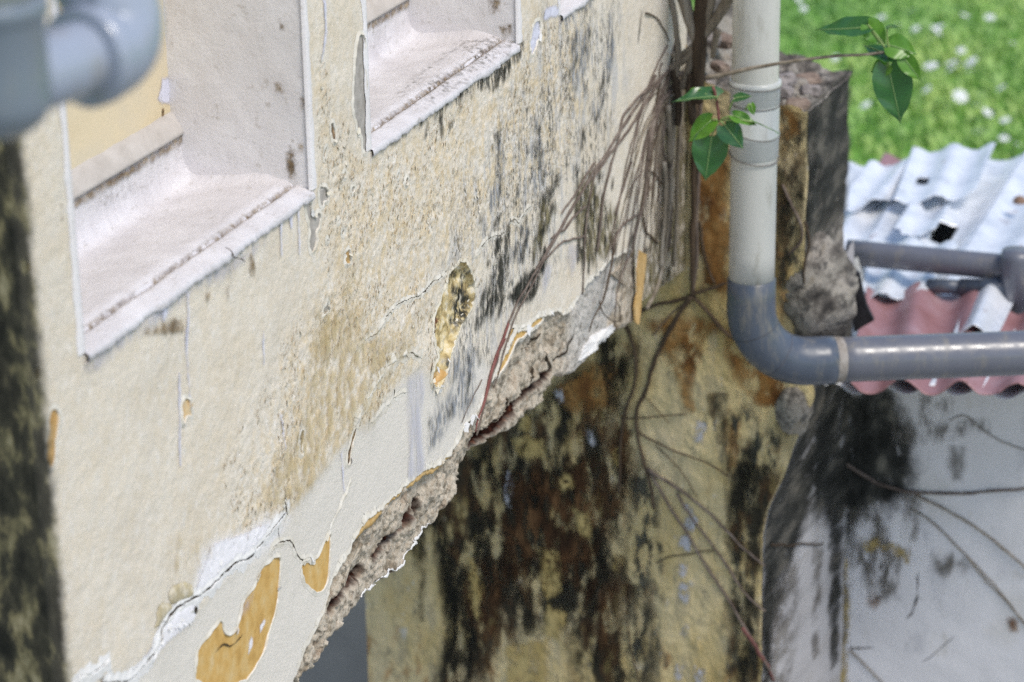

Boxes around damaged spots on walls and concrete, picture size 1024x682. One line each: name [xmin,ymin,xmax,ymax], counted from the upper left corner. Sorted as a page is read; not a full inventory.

damp [373,25,523,138]
damp [544,2,614,121]
damp [475,119,561,329]
damp [575,169,633,273]
damp [643,80,687,300]
crack [71,490,316,682]
peeling [133,319,307,682]
crack [329,477,352,530]
spalling [293,245,646,682]
damp [413,338,662,682]
damp [707,384,916,682]